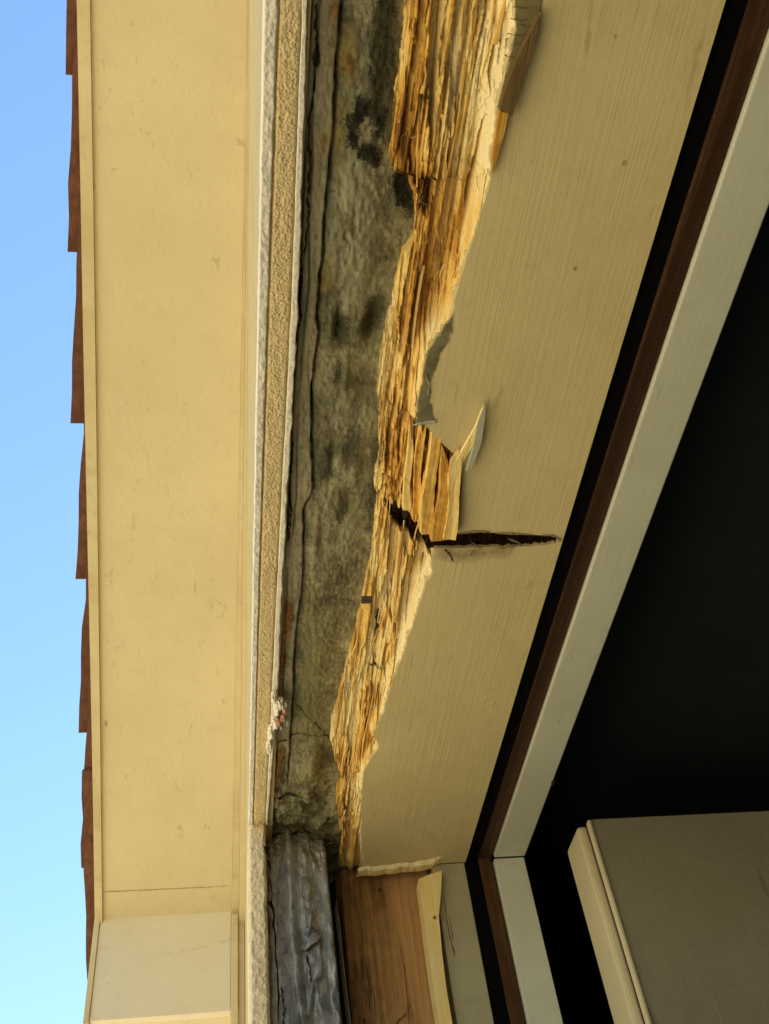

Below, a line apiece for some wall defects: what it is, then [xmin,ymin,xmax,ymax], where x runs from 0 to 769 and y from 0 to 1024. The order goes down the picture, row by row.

leakage [323,0,415,348]
peeling [491,0,542,174]
peeling [413,318,452,426]
leakage [316,364,379,563]
crack [427,530,561,561]